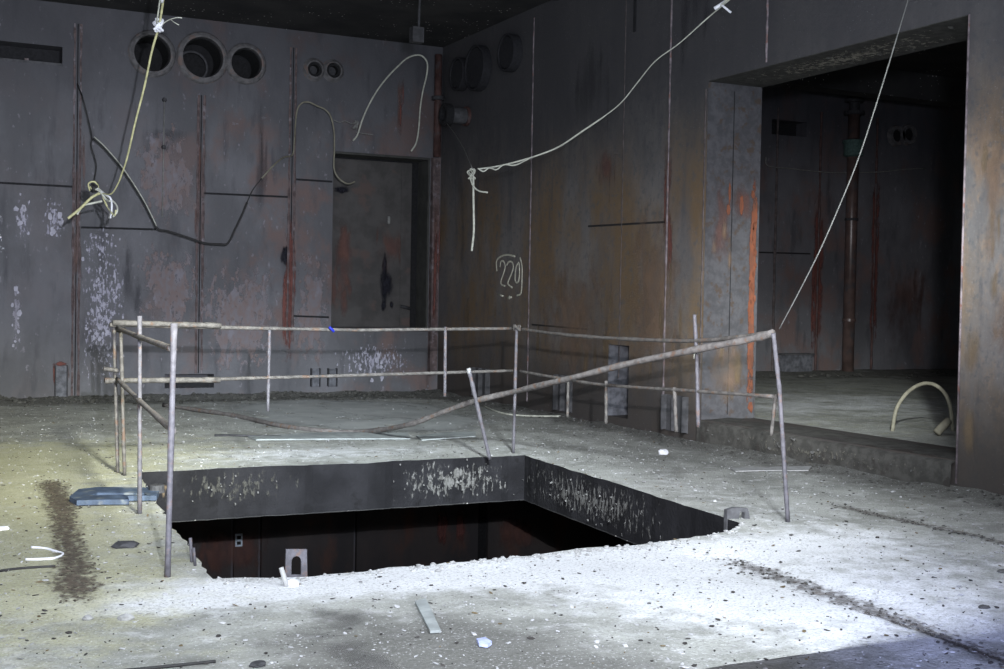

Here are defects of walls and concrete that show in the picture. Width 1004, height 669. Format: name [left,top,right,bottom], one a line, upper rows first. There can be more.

peeling [13,193,30,241]
peeling [41,198,64,237]
peeling [11,285,22,350]
peeling [81,229,124,384]
rust [811,213,824,348]